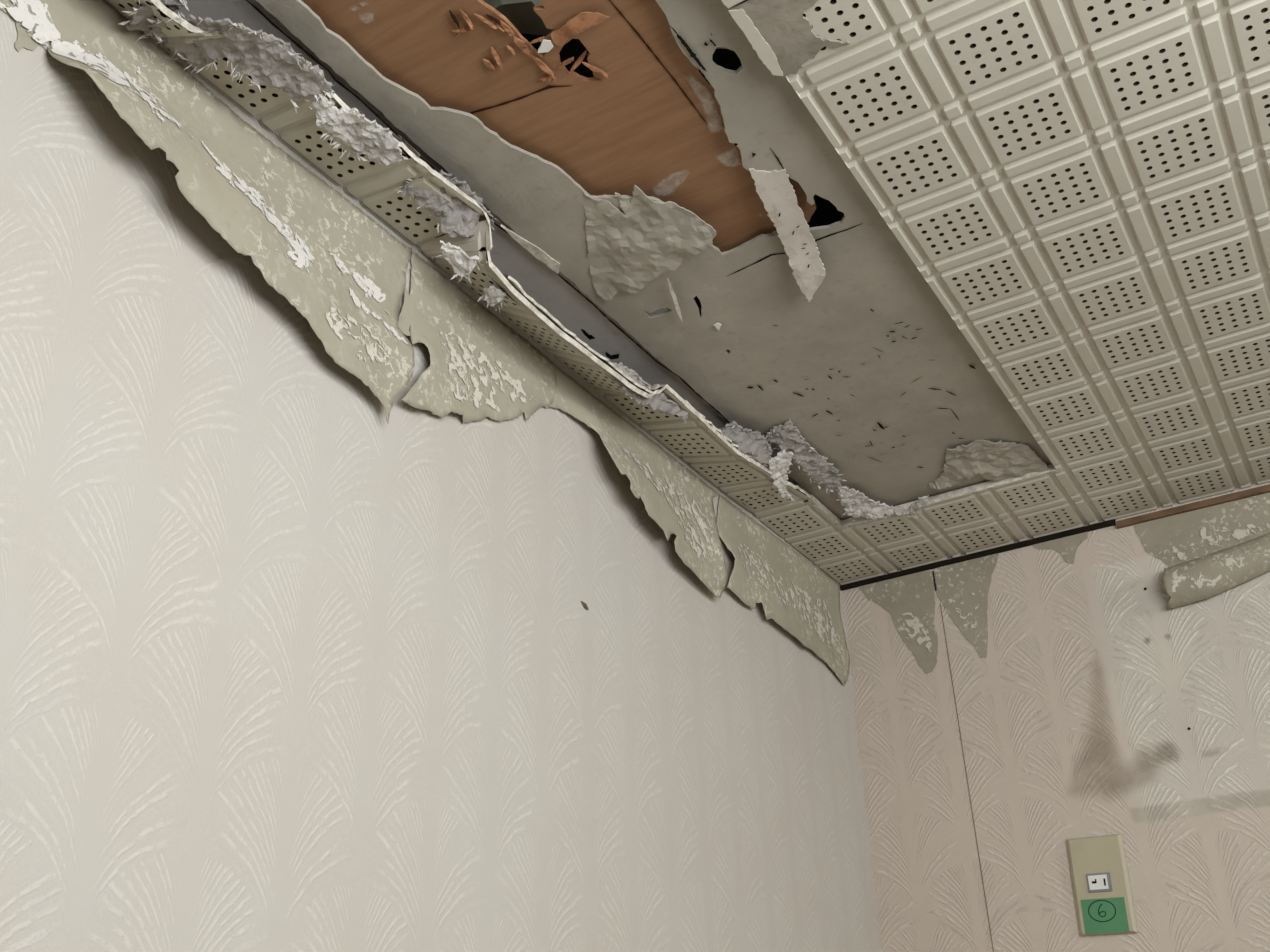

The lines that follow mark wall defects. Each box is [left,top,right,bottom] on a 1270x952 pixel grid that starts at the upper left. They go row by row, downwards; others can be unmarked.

peeling [538,39,553,53]
peeling [722,0,850,78]
peeling [503,274,654,394]
peeling [684,399,768,468]
peeling [1134,492,1270,567]
peeling [859,553,999,674]